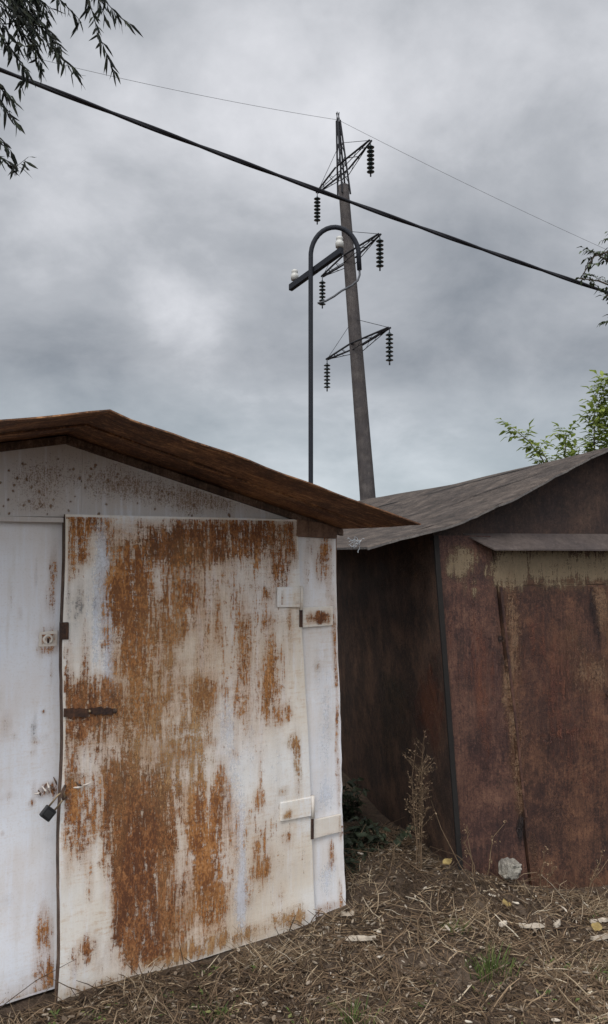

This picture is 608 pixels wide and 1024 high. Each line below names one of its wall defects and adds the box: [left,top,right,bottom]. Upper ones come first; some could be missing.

rust [306,538,332,587]
peeling [446,546,608,597]
rust [0,453,306,996]
rust [498,589,524,842]